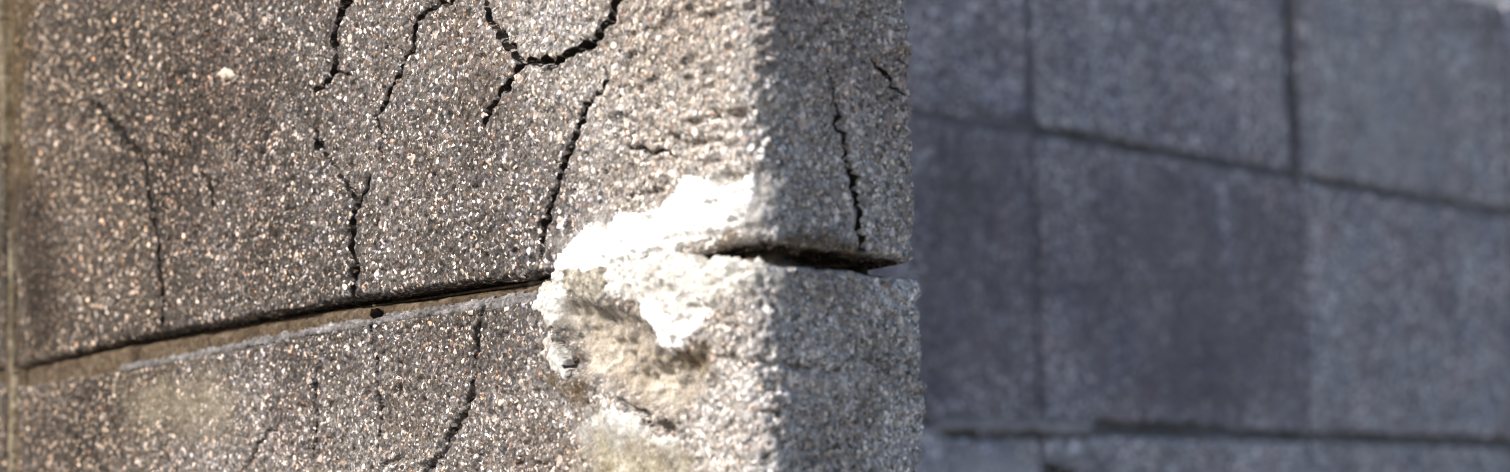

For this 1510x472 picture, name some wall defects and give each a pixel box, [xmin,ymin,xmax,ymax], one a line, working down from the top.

crack [89,101,165,328]
crack [313,0,623,446]
crack [629,143,678,158]
crack [826,68,866,251]
crack [871,59,905,95]
crack [1047,463,1075,472]